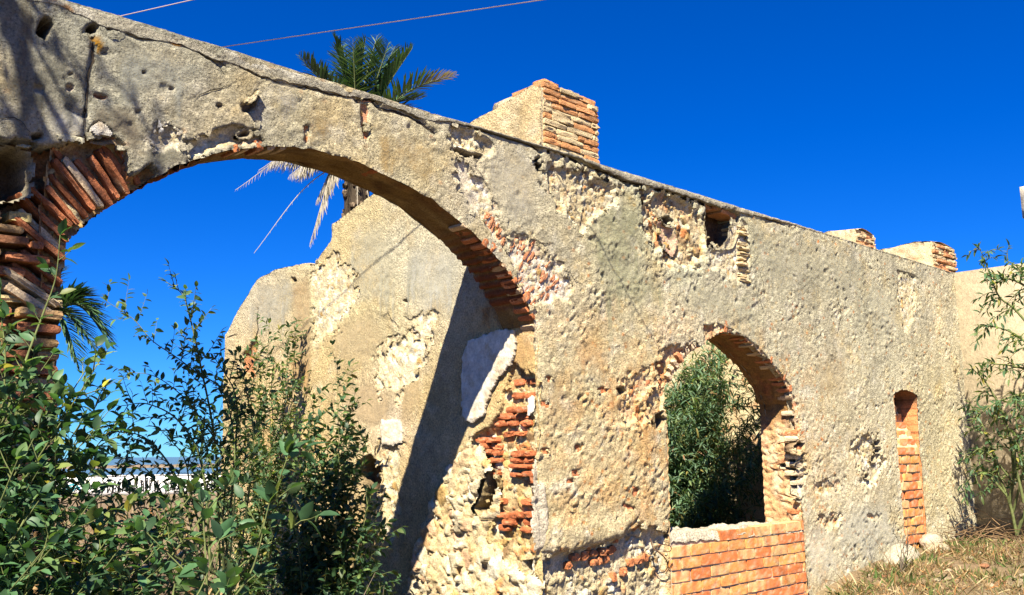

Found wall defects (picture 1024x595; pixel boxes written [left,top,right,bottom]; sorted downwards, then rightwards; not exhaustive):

spalling [56,121,126,157]
spalling [143,120,261,162]
flaking render [244,90,261,105]
spalling [447,122,574,315]
spalling [538,149,623,235]
spalling [637,184,751,287]
flaking render [0,144,64,483]
spalling [372,309,440,405]
spalling [597,323,802,437]
flaking render [461,329,671,595]